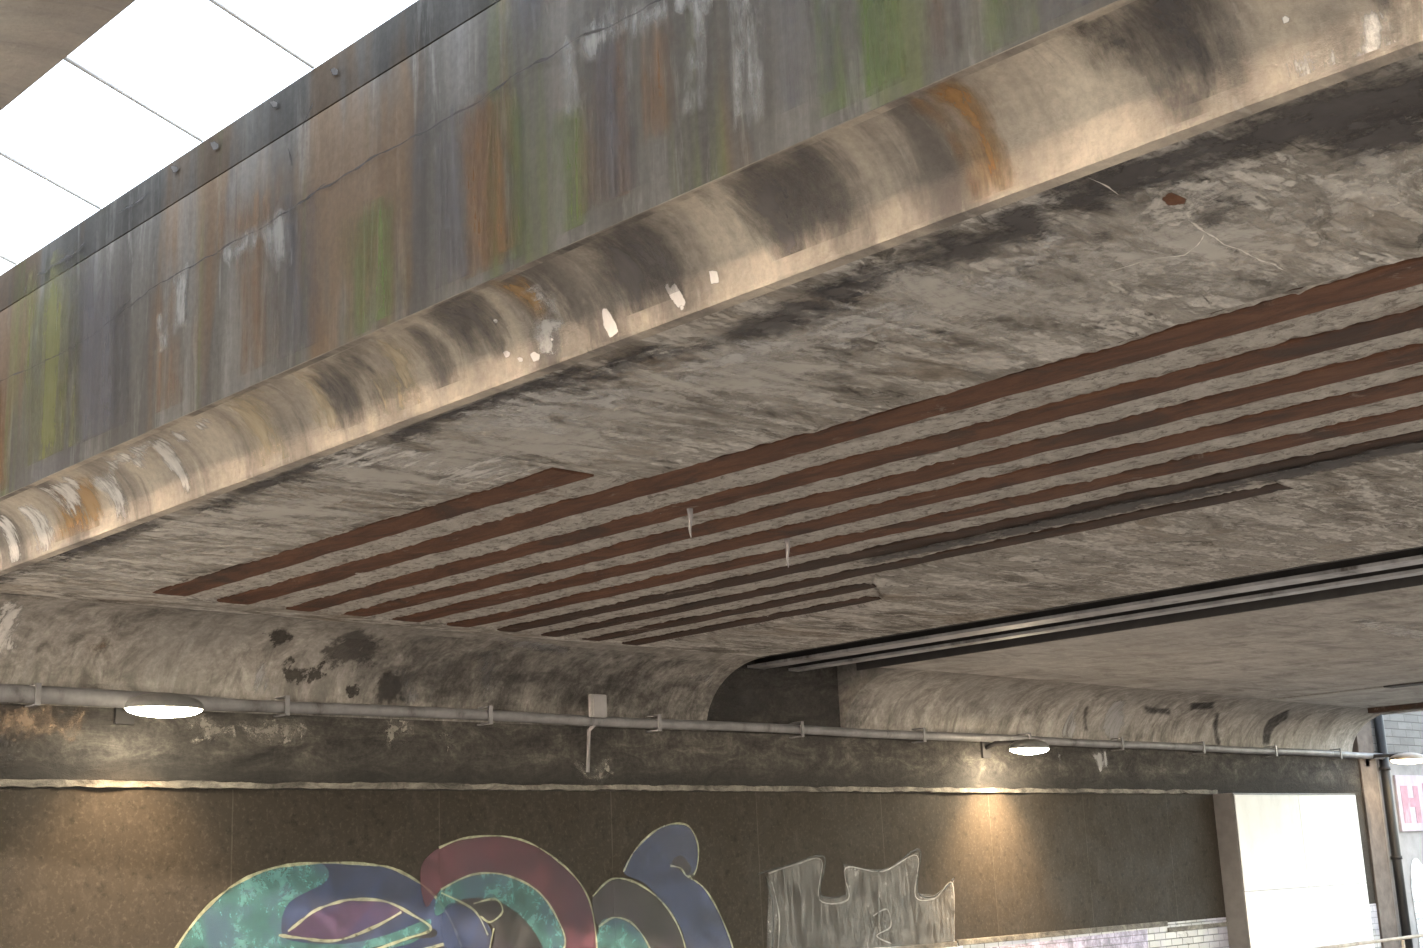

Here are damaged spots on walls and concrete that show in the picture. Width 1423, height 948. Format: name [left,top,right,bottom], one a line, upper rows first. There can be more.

damp [625,0,701,33]
damp [1112,0,1214,88]
damp [1360,0,1390,56]
rust [921,84,1010,186]
peeling [1141,180,1244,231]
peeling [709,271,719,284]
damp [0,57,1423,584]
rust [58,481,102,538]
spalling [151,283,1423,685]
damp [0,602,22,653]
peeling [188,715,308,744]
spalling [377,672,413,744]